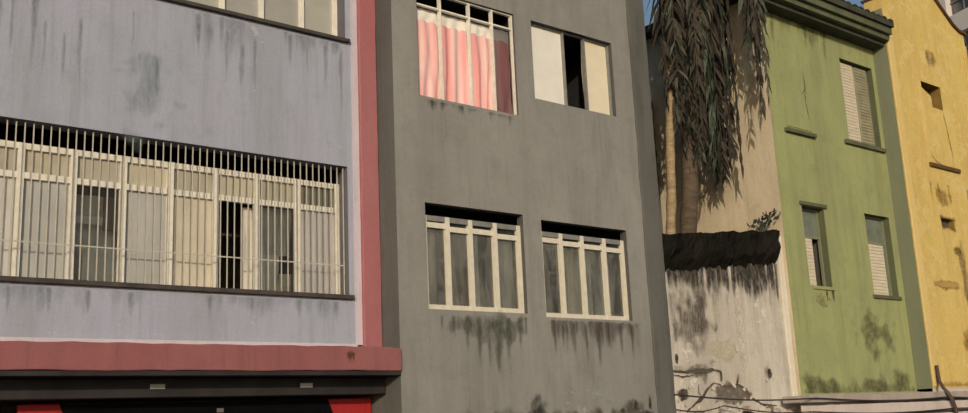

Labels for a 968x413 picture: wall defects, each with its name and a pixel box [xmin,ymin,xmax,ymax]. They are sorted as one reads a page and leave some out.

damp [675,295,717,338]
damp [453,317,526,358]
damp [552,320,634,350]
spalling [678,385,692,407]
spalling [711,382,762,413]